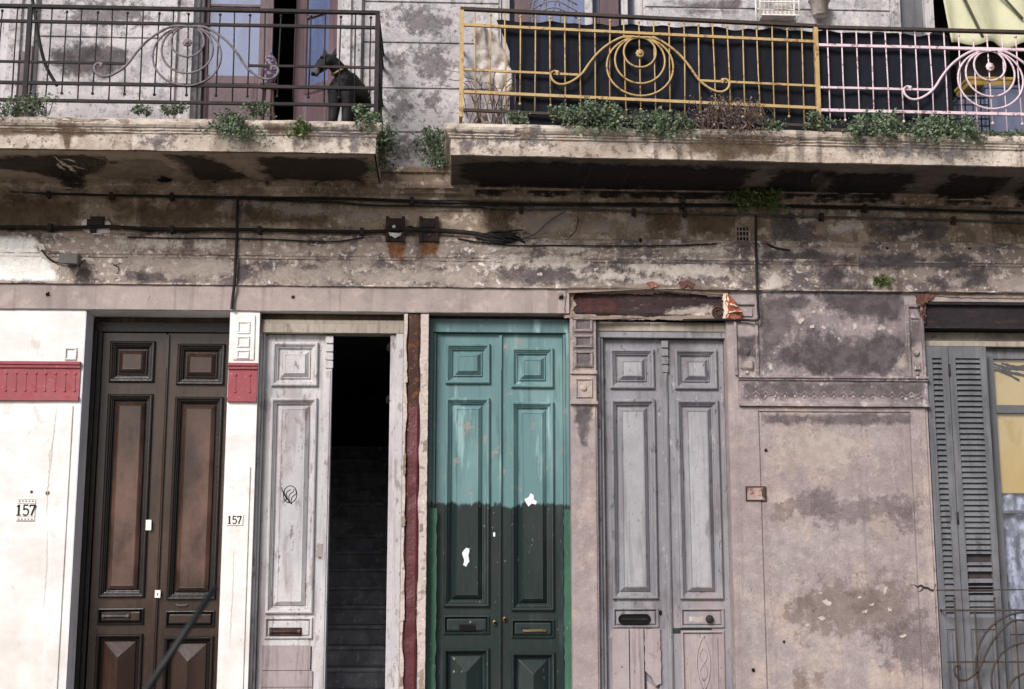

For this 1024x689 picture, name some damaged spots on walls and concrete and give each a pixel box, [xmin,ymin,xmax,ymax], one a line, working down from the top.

leakage [381,3,459,160]
leakage [0,123,374,236]
peeling [0,236,59,298]
peeling [114,234,233,281]
corrosion [387,242,405,262]
corrosion [420,239,439,256]
flaking render [260,207,743,321]
leakage [455,126,989,399]
leakage [575,407,591,446]